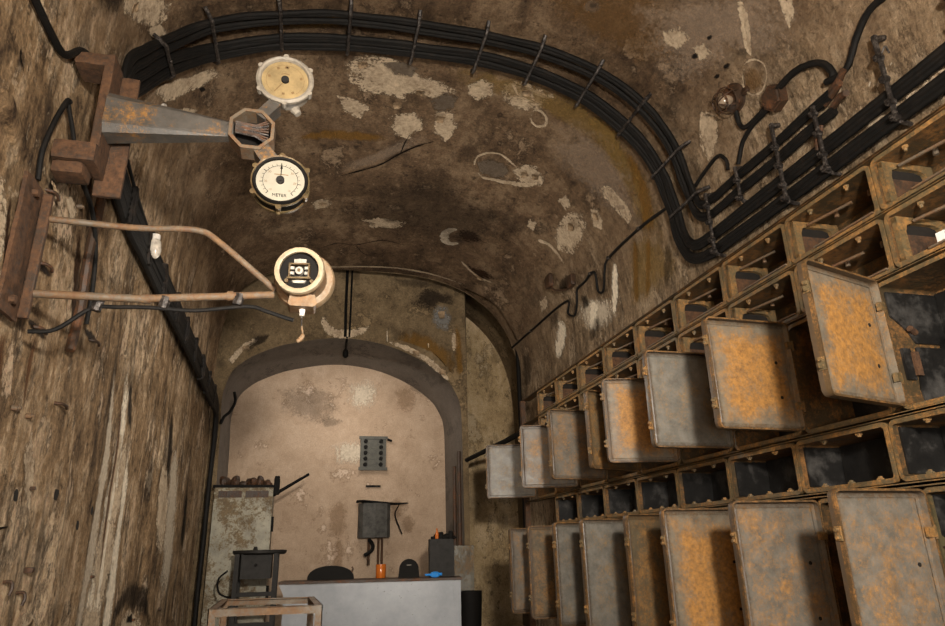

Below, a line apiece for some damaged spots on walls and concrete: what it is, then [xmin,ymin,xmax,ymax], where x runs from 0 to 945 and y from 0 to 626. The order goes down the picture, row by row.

flaking render [661,27,712,60]
flaking render [737,1,752,56]
flaking render [778,0,794,29]
flaking render [336,55,554,142]
crack [341,135,434,176]
flaking render [699,112,718,161]
flaking render [527,195,603,263]
flaking render [601,186,632,224]